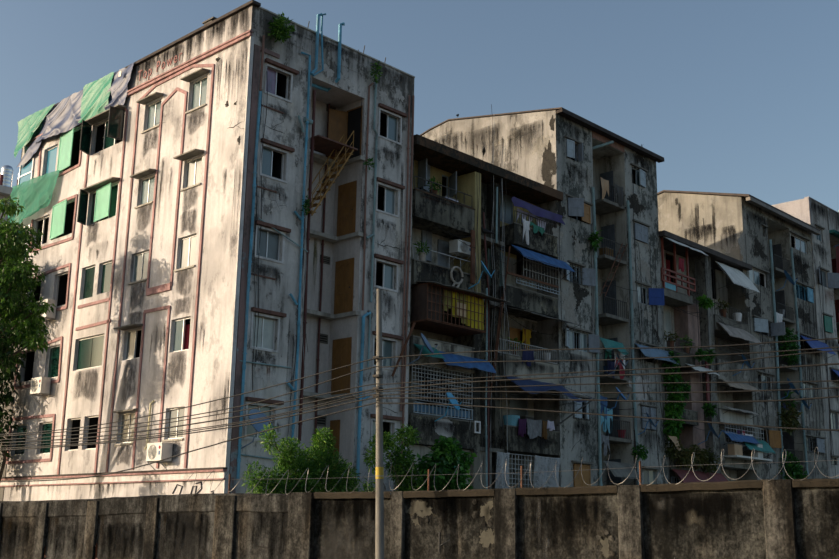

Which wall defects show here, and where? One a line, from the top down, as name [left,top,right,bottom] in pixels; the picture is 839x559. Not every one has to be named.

water stain [138,32,204,76]
water stain [189,108,204,132]
water stain [443,122,543,157]
water stain [139,162,171,229]
water stain [685,208,734,240]
water stain [753,236,767,262]
water stain [122,361,136,402]
water stain [168,353,184,383]
peeling [405,500,433,526]
peeling [472,496,494,554]
water stain [662,493,738,533]
peeling [596,530,616,559]